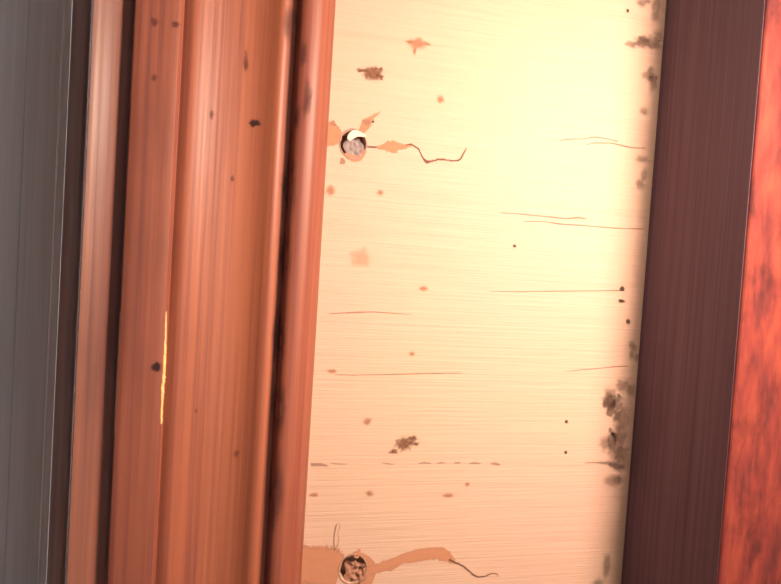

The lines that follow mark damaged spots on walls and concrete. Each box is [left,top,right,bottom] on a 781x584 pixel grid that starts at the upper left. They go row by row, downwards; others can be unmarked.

peeling [327,111,381,146]
peeling [340,149,367,164]
crack [367,140,467,164]
flaking render [301,545,376,584]
crack [363,547,498,578]